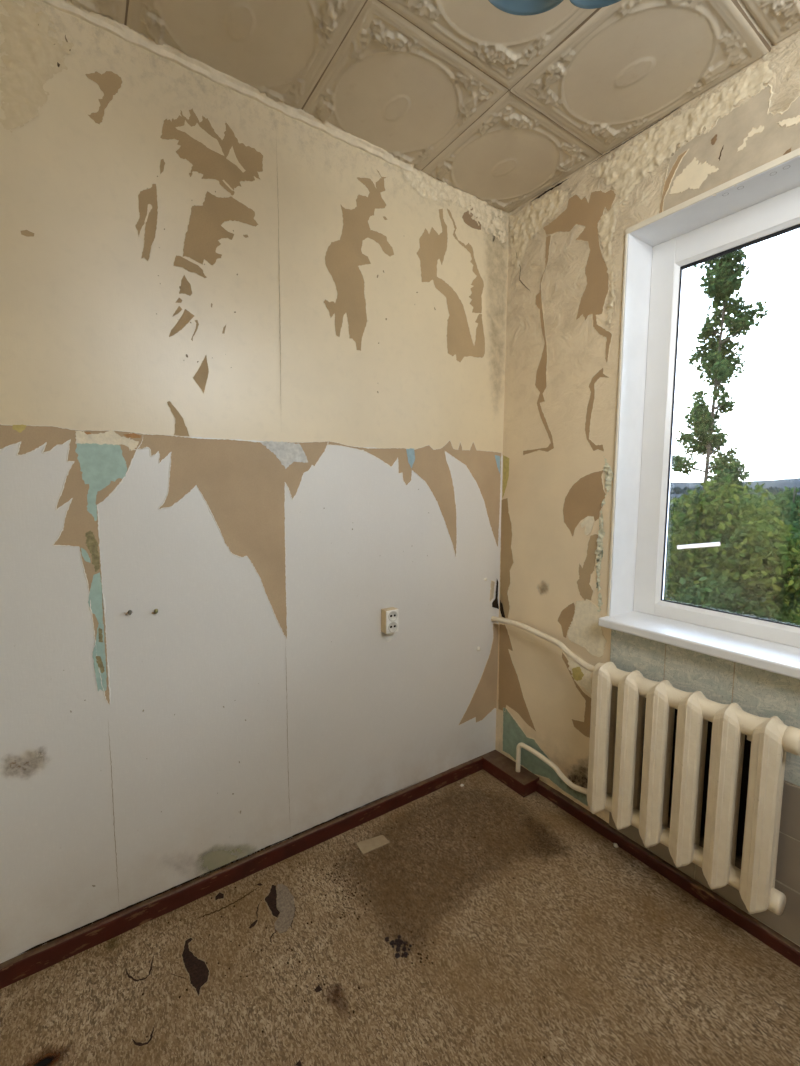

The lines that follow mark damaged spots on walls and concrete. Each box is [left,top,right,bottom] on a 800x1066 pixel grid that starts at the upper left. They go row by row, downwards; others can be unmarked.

peeling [85,71,122,124]
peeling [135,159,165,261]
peeling [160,108,263,341]
peeling [324,170,394,351]
peeling [183,354,226,393]
flaking render [402,60,800,738]
peeling [0,401,536,731]
leakage [203,849,241,871]